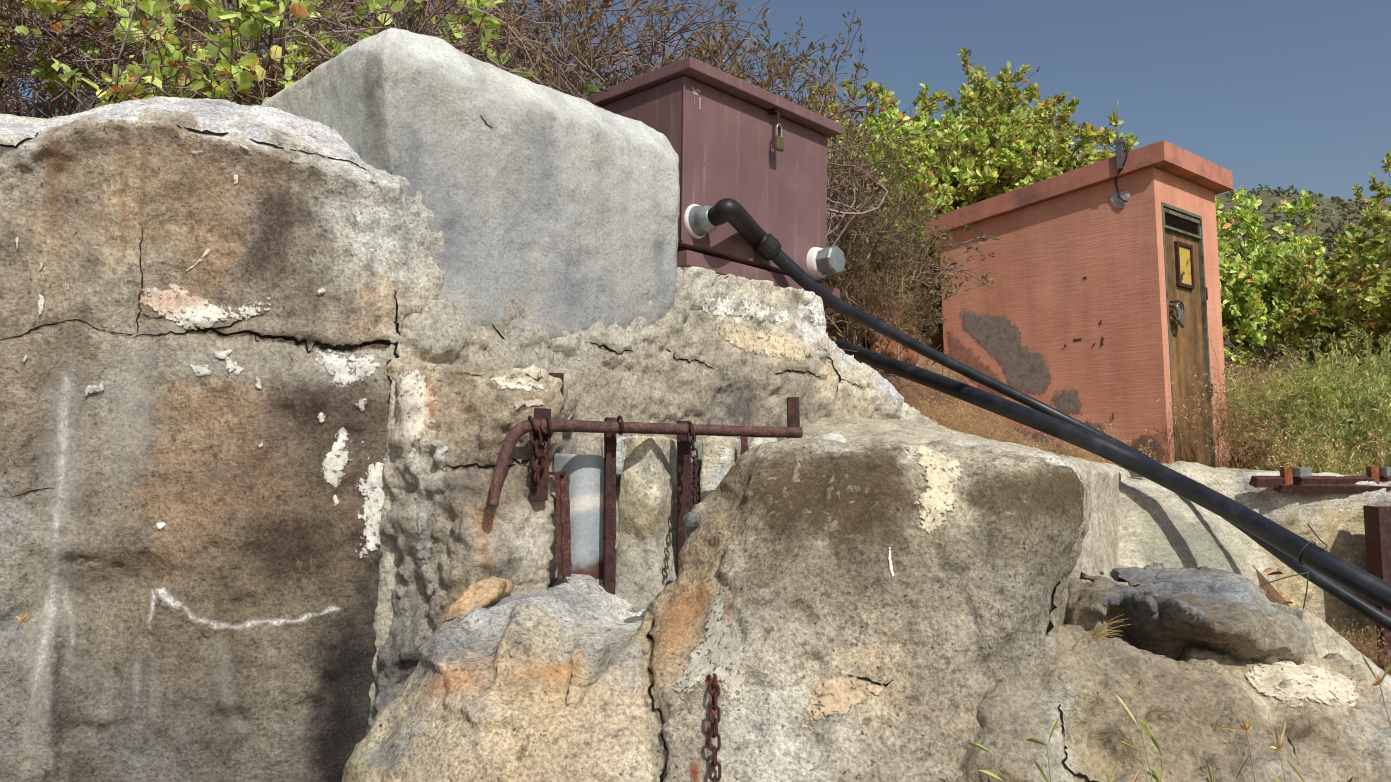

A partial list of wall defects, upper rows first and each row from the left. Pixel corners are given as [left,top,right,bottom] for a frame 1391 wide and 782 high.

crack [175,124,367,170]
crack [0,228,400,415]
peeling [140,284,277,331]
peeling [945,307,1114,432]
peeling [320,368,449,566]
peeling [1015,425,1081,456]
peeling [1130,433,1165,462]
crack [646,619,668,782]
crack [1058,704,1100,782]